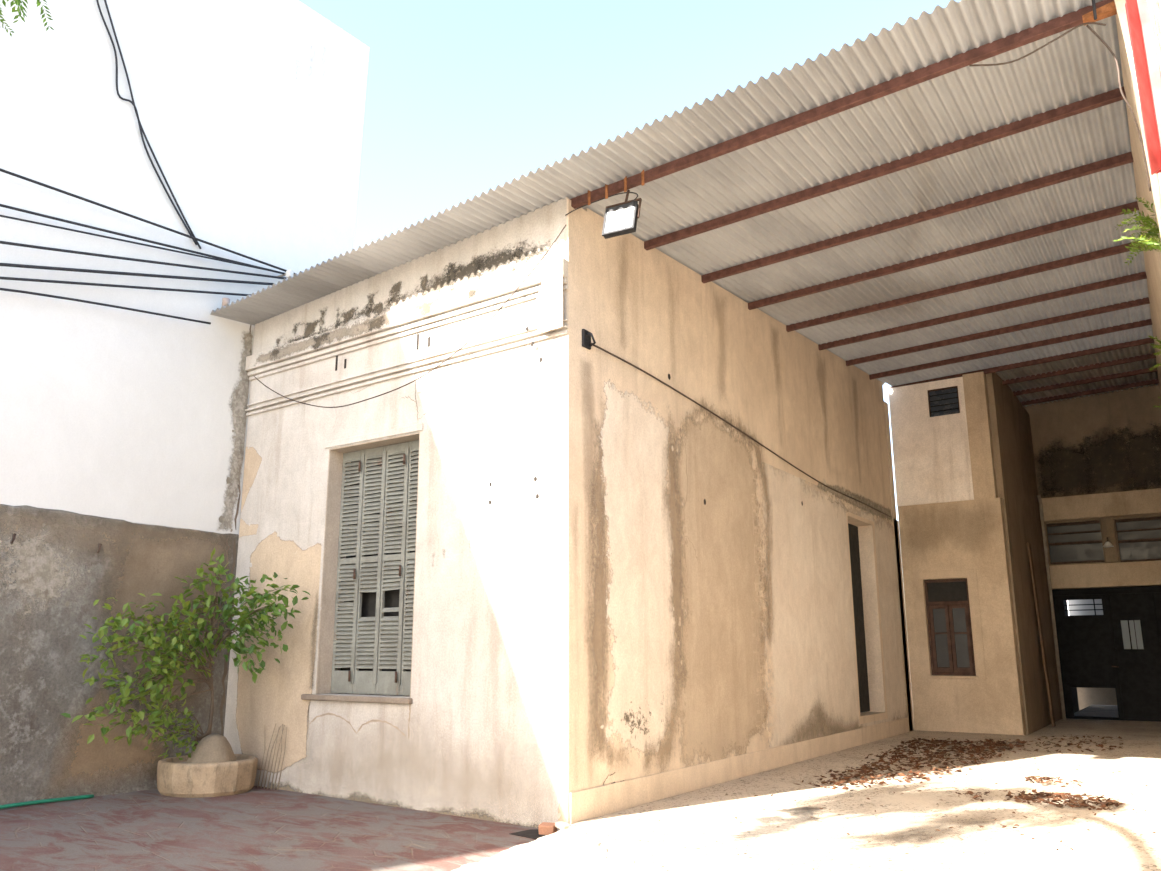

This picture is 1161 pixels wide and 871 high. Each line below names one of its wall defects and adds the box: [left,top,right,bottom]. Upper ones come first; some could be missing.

peeling [219,332,323,773]
damp [257,242,548,362]
peeling [525,274,568,557]
damp [592,433,685,766]
damp [700,407,770,531]
damp [797,708,855,742]